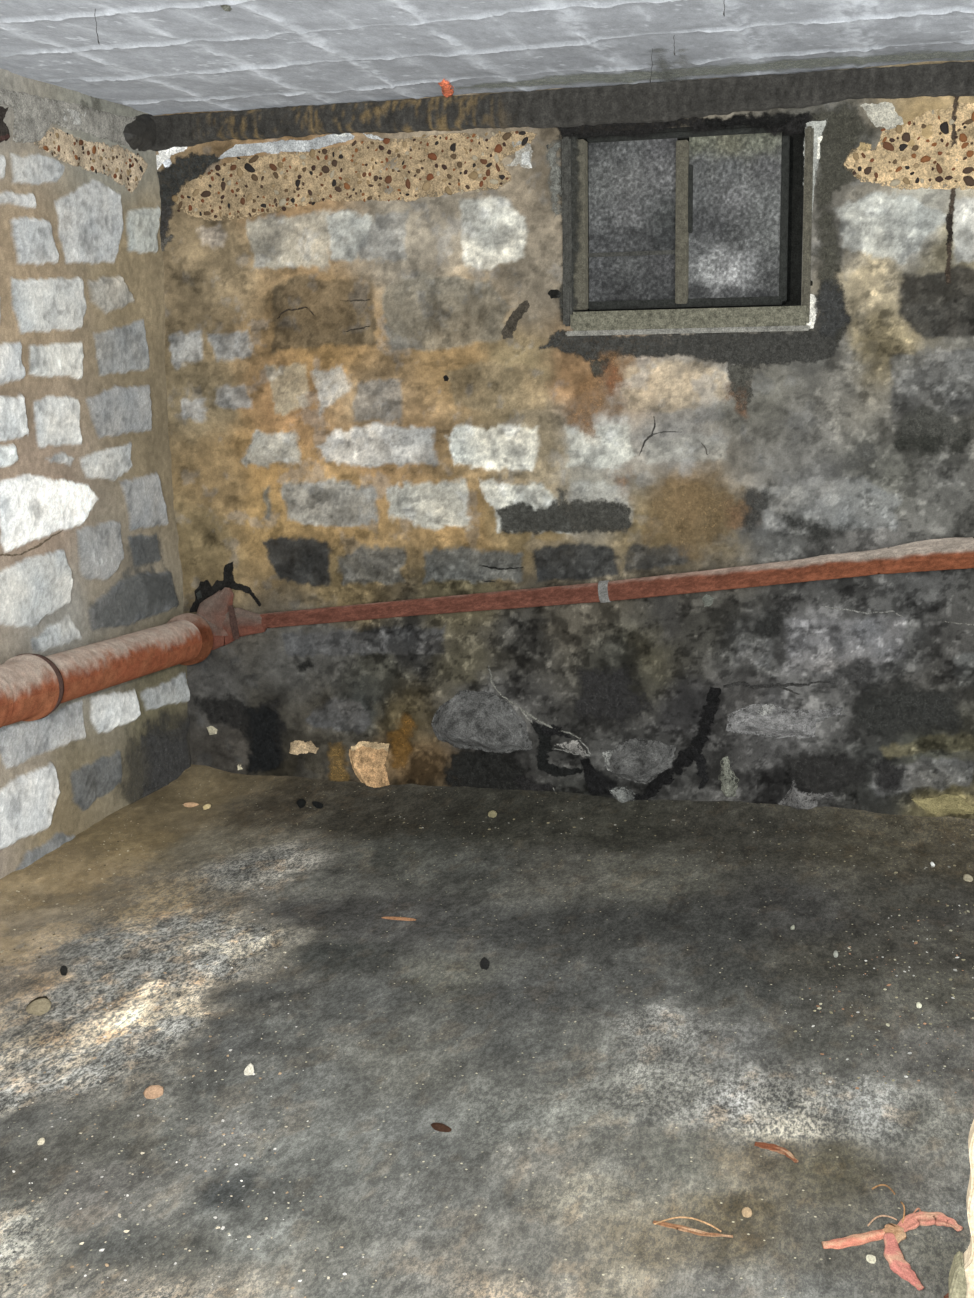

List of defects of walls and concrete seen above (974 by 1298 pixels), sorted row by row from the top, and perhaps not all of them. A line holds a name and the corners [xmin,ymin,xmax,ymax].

damp [896,406,973,456]
damp [496,488,631,535]
damp [744,483,770,530]
damp [782,514,846,540]
damp [753,613,783,637]
damp [811,658,961,737]
damp [121,695,286,803]
rust [329,747,349,781]
damp [444,748,551,791]
damp [583,761,616,795]
crack [488,668,828,800]
damp [787,754,904,792]